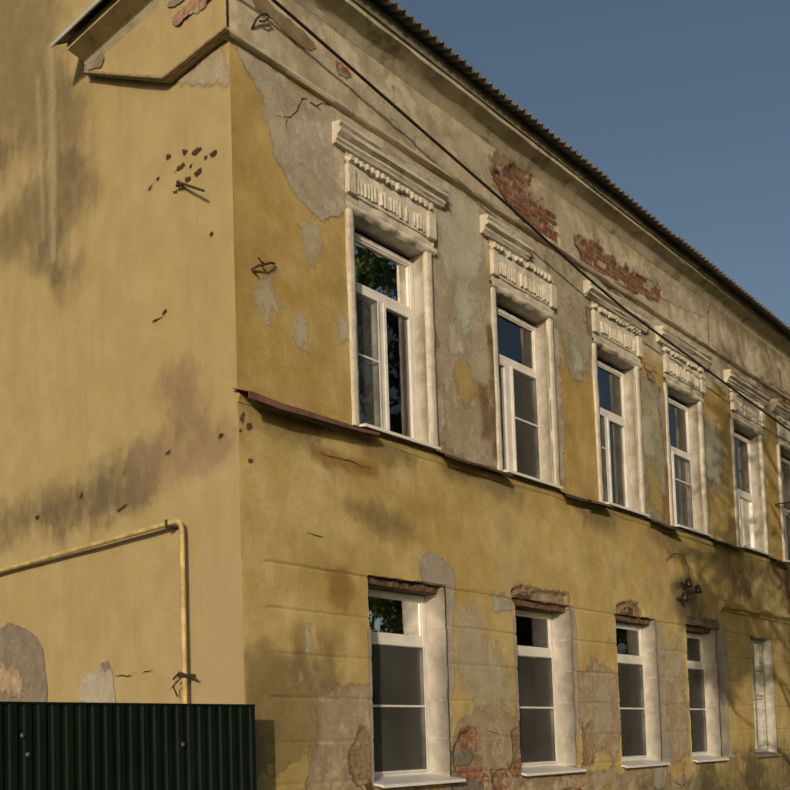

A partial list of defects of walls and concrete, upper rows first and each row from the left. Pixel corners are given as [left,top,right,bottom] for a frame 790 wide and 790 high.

damp [38,46,56,259]
flaking render [174,147,217,182]
flaking render [235,45,346,266]
crack [275,98,330,130]
flaking render [362,87,425,144]
flaking render [252,271,283,324]
flaking render [432,251,497,471]
flaking render [448,128,712,486]
flaking render [0,623,48,702]
flaking render [257,627,376,790]
flaking render [445,584,570,790]
peeling [574,659,622,767]